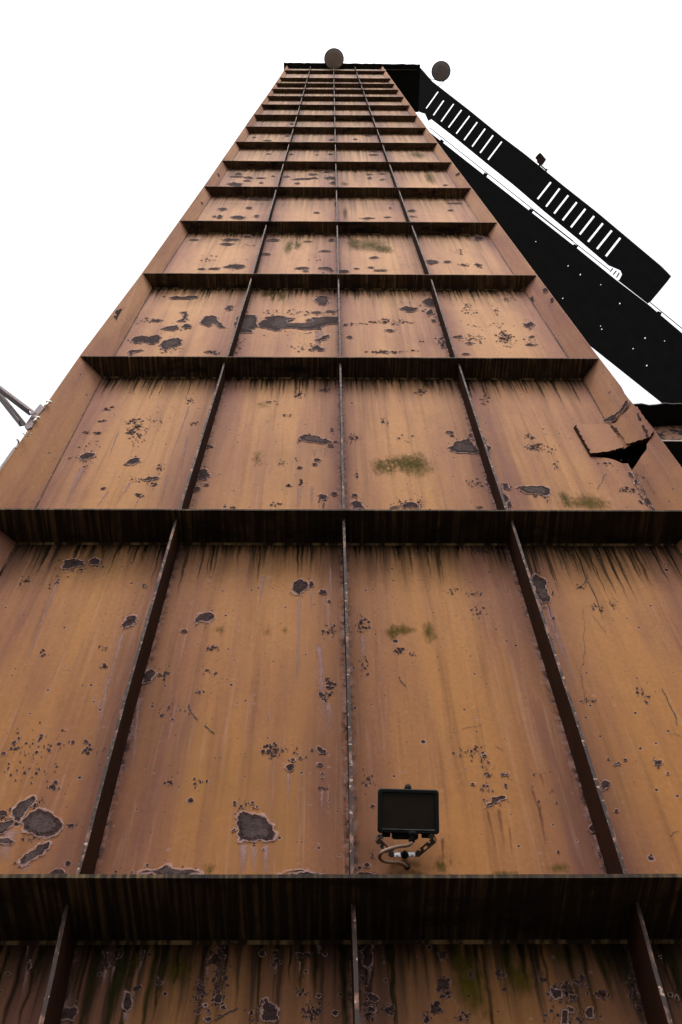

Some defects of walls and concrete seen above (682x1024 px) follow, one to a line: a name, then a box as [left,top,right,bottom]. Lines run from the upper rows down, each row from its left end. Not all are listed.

peeling [127,294,436,355]
peeling [446,430,492,454]
peeling [603,400,629,422]
peeling [466,478,552,510]
peeling [32,555,107,656]
peeling [180,611,215,633]
peeling [292,566,332,661]
leakage [553,546,675,612]
peeling [0,722,106,869]
peeling [452,745,510,807]
peeling [231,798,278,864]
leakage [107,945,182,1024]